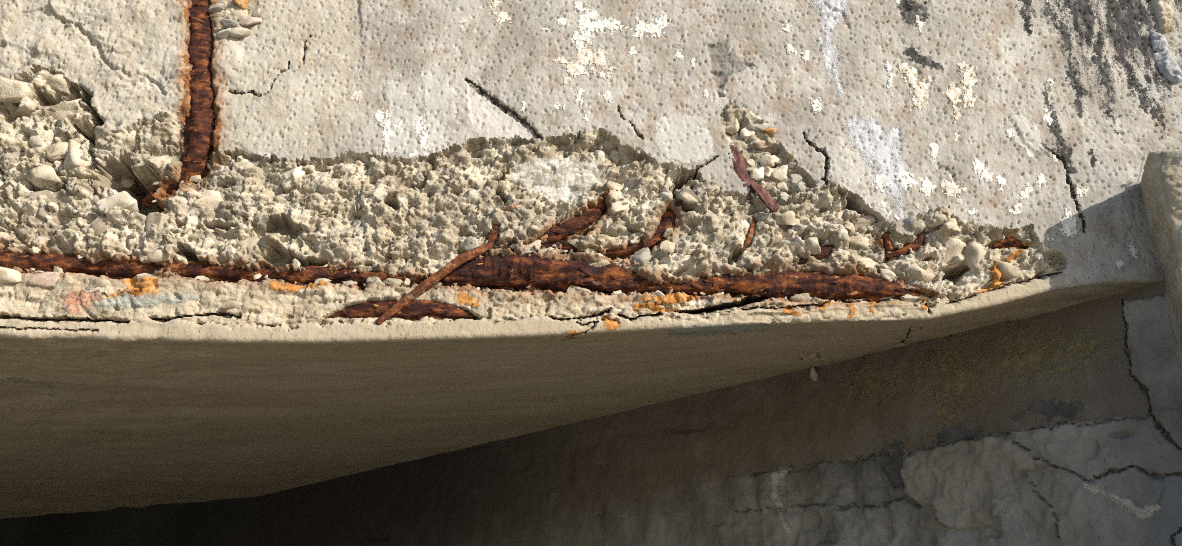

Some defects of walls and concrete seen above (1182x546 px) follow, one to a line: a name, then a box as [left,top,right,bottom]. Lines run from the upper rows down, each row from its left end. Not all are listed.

corrosion [141,0,223,213]
crack [228,35,311,97]
crack [465,78,543,139]
spalling [0,34,1068,331]
damp [542,0,674,121]
corrosion [728,145,780,213]
crack [803,132,830,185]
damp [885,47,978,141]
damp [872,158,1046,220]
damp [1006,0,1179,241]
corrosion [0,198,931,321]
crack [0,312,242,331]